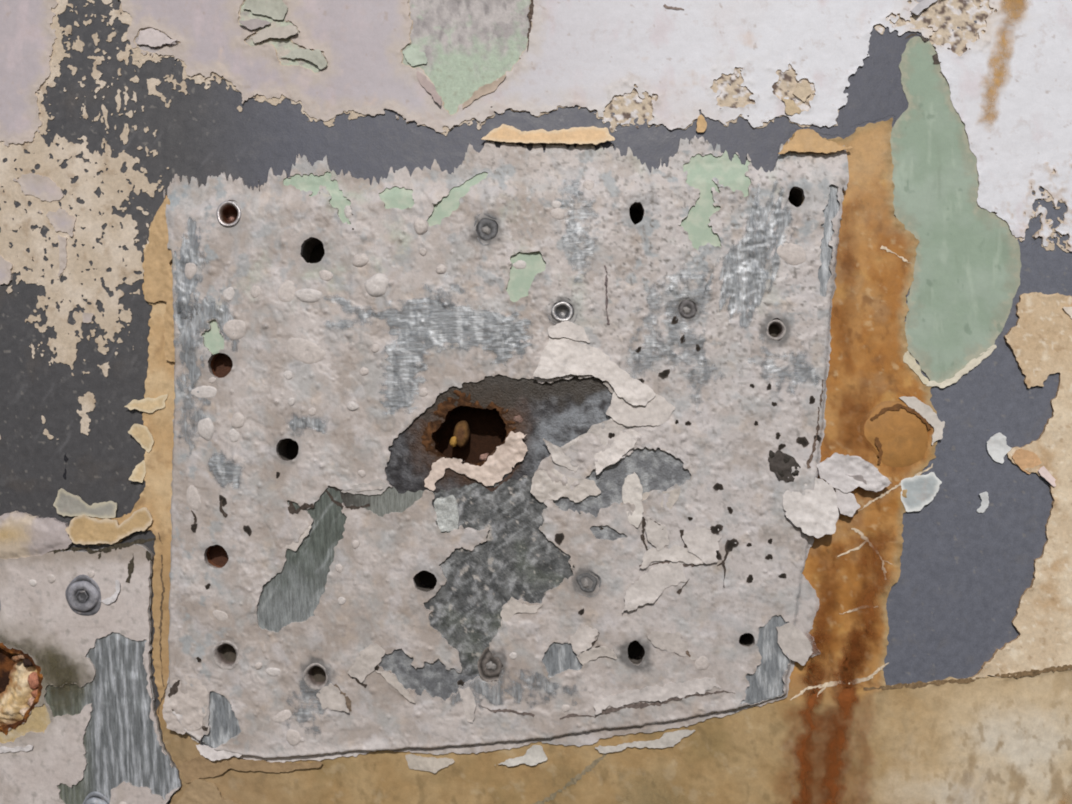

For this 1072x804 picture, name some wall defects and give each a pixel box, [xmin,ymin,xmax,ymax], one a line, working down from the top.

corrosion [985,0,1024,120]
peeling [0,0,852,552]
peeling [842,0,1072,686]
peeling [257,181,792,723]
peeling [768,432,891,538]
corrosion [0,643,43,735]
peeling [0,632,324,804]
peeling [740,615,813,705]
corrosion [793,535,886,804]